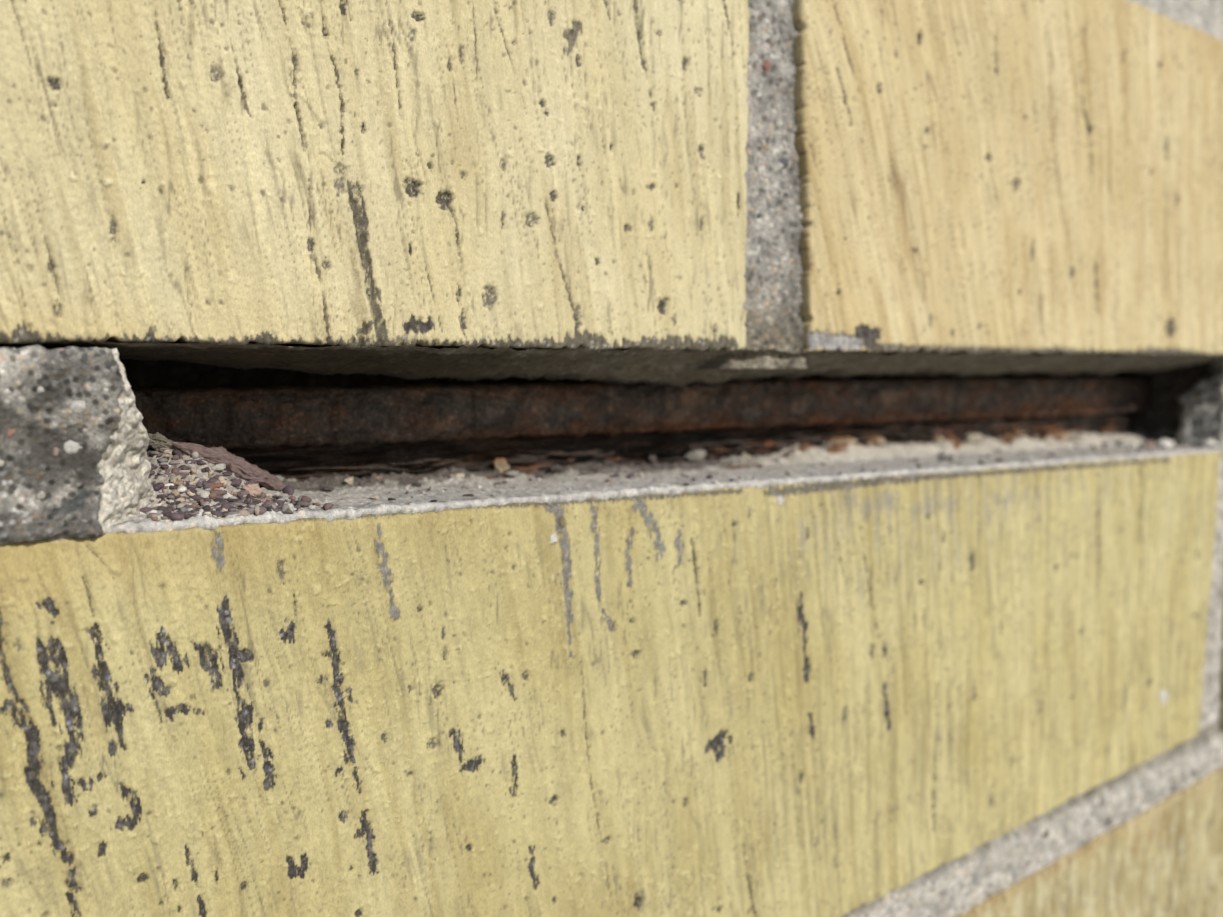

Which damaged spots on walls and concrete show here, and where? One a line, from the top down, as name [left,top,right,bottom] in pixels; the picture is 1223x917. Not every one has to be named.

spalling [97,348,154,535]